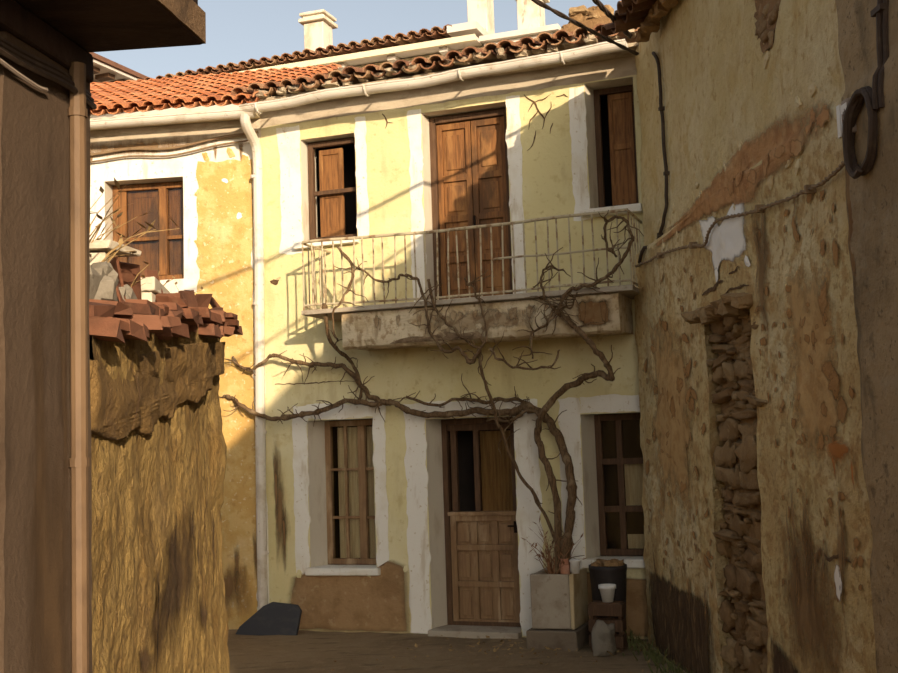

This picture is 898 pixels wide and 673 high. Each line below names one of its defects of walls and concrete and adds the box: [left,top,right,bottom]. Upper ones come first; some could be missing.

spalling [754,0,781,69]
crack [524,94,567,151]
damp [139,511,207,673]
damp [224,551,245,606]